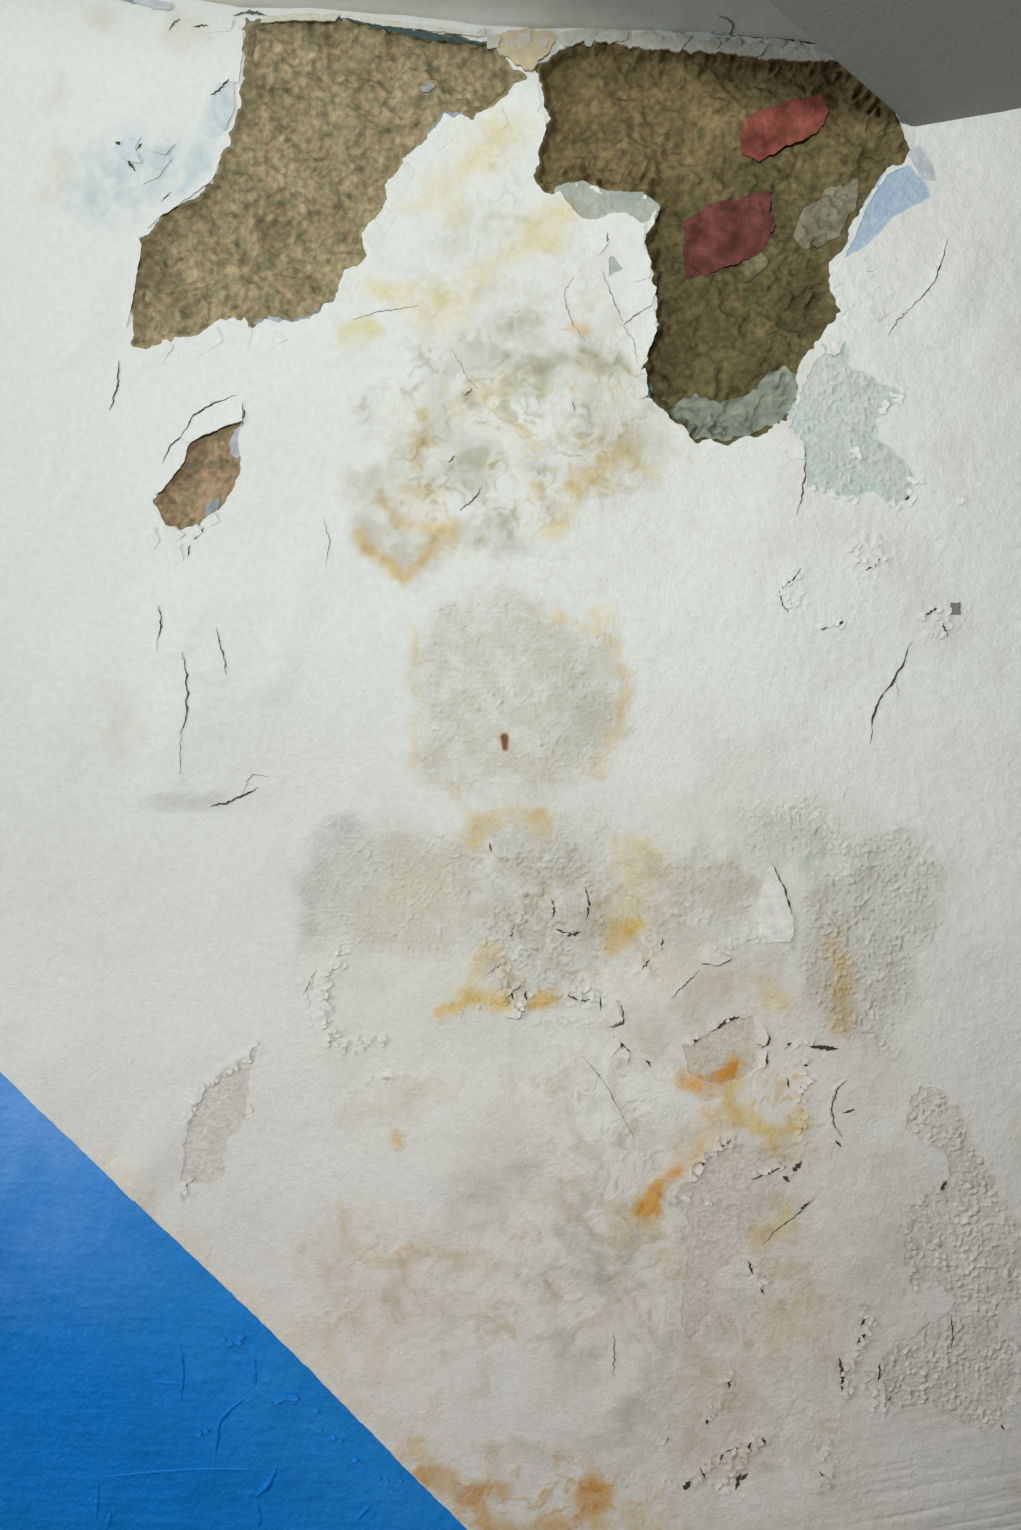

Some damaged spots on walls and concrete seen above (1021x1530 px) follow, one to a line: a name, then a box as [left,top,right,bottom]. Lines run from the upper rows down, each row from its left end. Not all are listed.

flaking render [123,0,935,507]
flaking render [146,395,245,567]
crack [156,606,189,774]
crack [216,629,227,673]
crack [870,643,912,744]
peeling [918,602,961,640]
crack [212,774,263,806]
water stain [88,85,947,1530]
peeling [181,1038,258,1185]
rust [667,1048,833,1166]
peeling [837,1086,1021,1433]
rust [400,1432,696,1530]